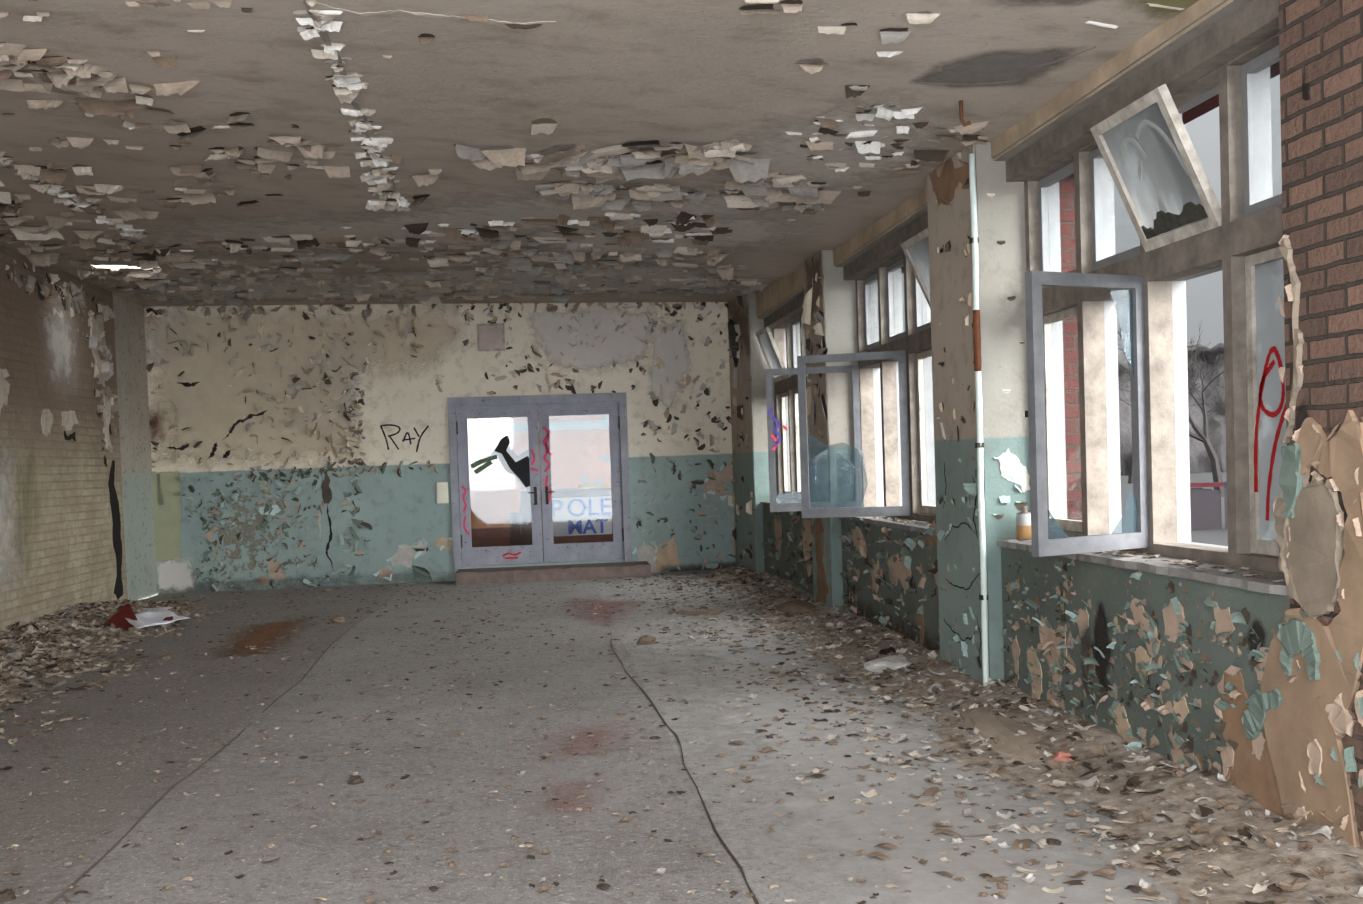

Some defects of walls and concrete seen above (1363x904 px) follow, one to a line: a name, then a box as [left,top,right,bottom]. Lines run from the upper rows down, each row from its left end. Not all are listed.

peeling [0,0,50,22]
peeling [125,0,253,13]
peeling [418,33,435,45]
peeling [817,23,858,35]
peeling [875,11,940,57]
flaking render [0,42,1030,673]